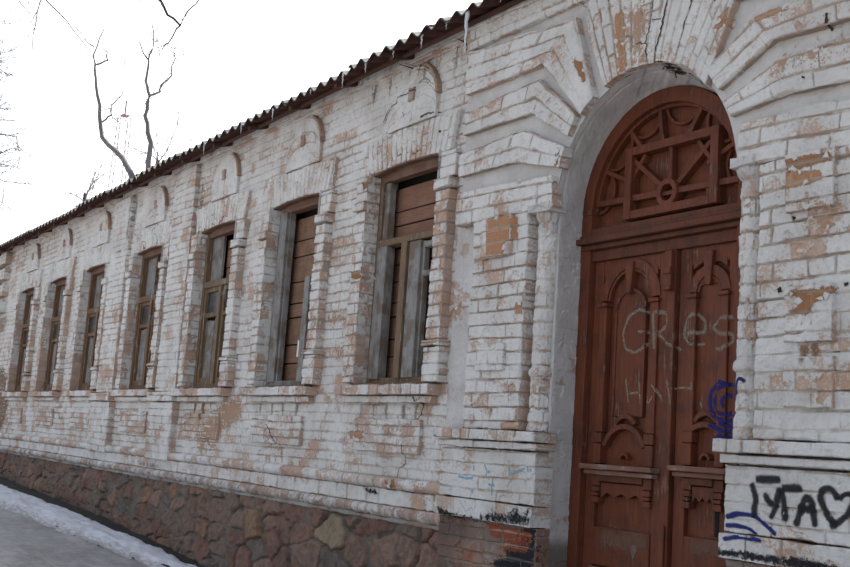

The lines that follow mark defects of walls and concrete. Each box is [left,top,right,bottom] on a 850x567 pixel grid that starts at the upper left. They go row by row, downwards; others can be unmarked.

spalling [613,0,654,72]
crack [635,0,707,88]
spalling [572,58,587,84]
spalling [785,150,843,240]
spalling [486,215,519,255]
spalling [788,286,839,316]
spalling [487,524,532,555]